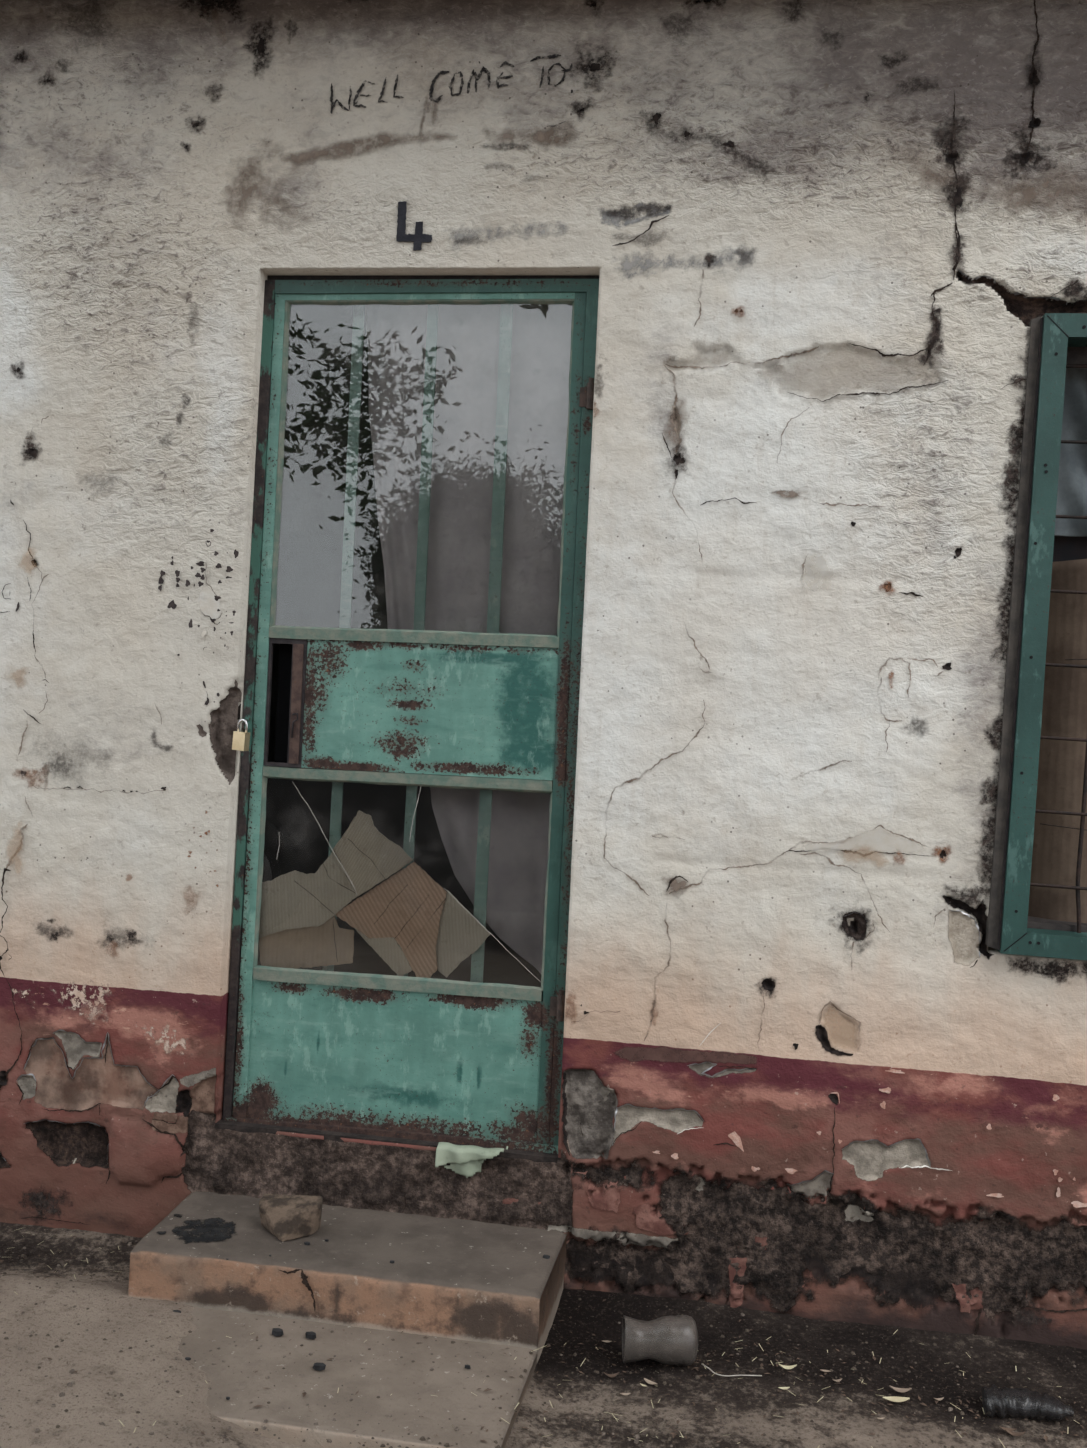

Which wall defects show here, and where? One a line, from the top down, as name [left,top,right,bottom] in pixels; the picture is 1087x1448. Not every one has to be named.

water stain [547,47,617,127]
crack [921,93,970,367]
crack [662,365,880,511]
flaking render [788,380,948,402]
water stain [991,330,1030,666]
flaking render [196,680,242,785]
water stain [977,684,1005,886]
crack [0,797,29,1088]
crack [573,825,925,1041]
flaking render [935,886,994,968]
water stain [1009,958,1087,983]
flaking render [17,977,1087,1325]